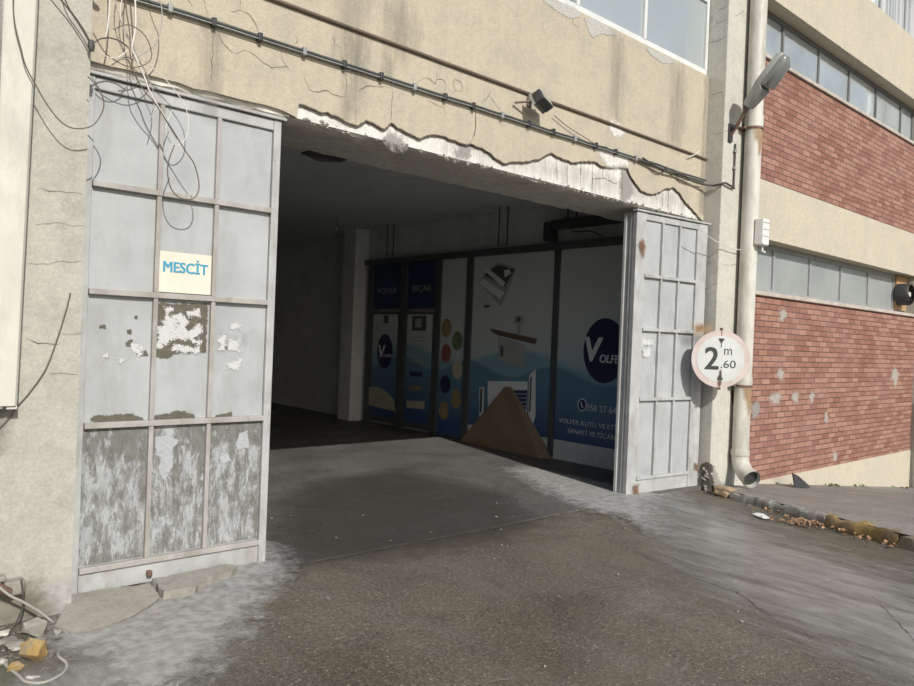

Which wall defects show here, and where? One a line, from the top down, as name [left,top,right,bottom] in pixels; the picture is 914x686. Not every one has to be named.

peeling [544,0,617,37]
crack [260,40,392,117]
spalling [286,104,696,220]
peeling [126,302,208,359]
peeling [78,410,262,565]
leakage [0,542,292,686]
leakage [510,466,914,681]